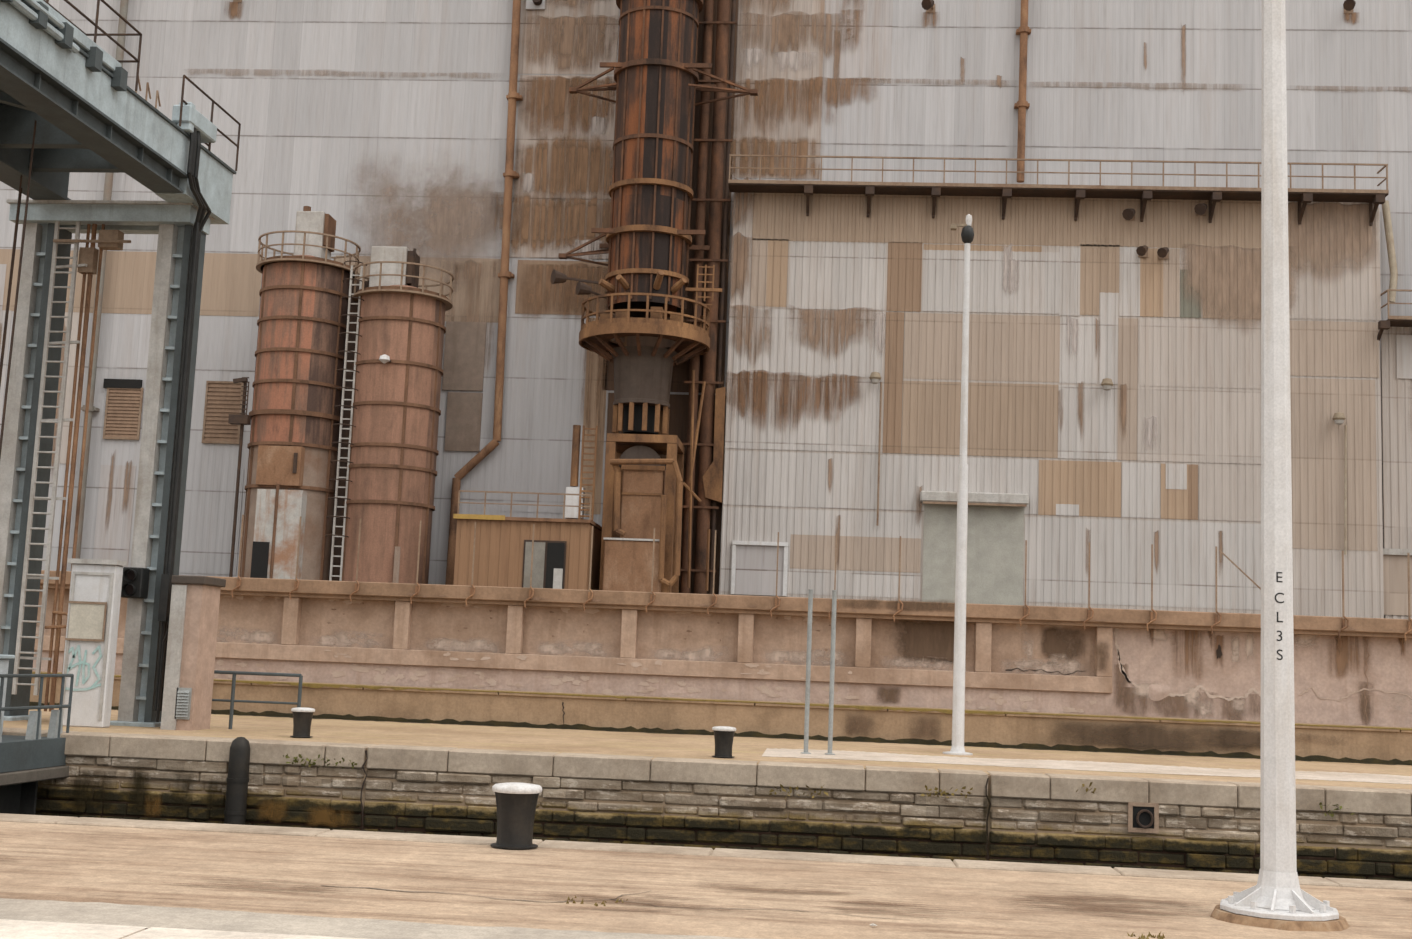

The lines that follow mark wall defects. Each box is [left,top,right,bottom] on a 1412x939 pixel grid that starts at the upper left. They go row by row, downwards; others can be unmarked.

corrosion [729,0,870,423]
corrosion [106,454,132,520]
leakage [133,771,148,807]